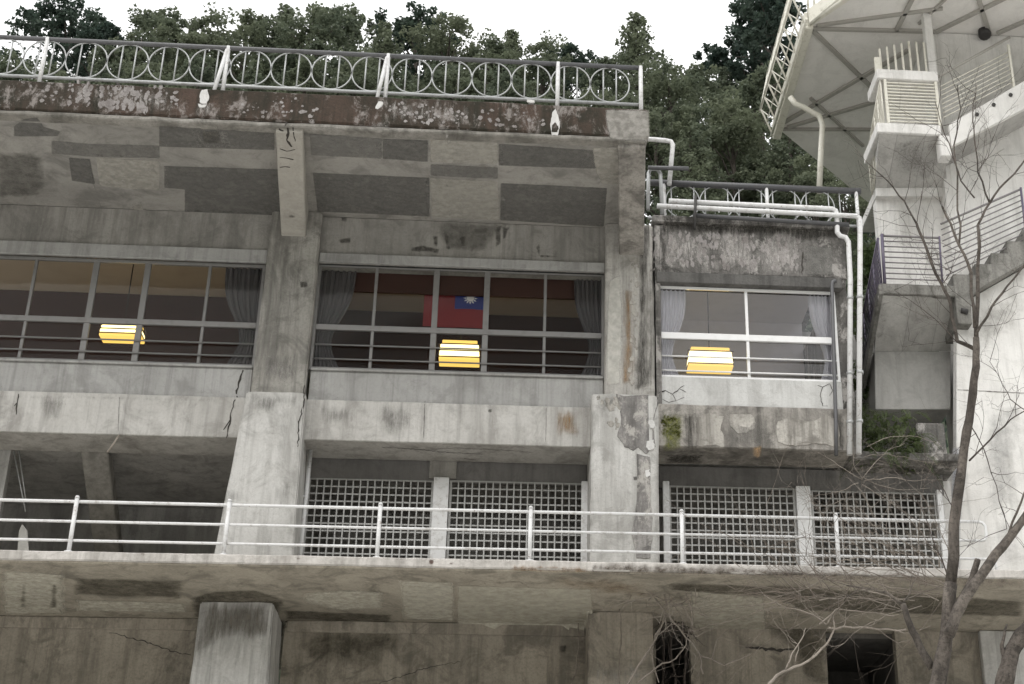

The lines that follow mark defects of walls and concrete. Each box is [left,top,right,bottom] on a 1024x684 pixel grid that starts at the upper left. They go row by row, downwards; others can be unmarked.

peeling [21,78,179,115]
peeling [198,89,209,108]
peeling [241,97,319,124]
crack [279,122,296,168]
damp [310,134,607,252]
crack [223,370,244,438]
crack [297,385,305,447]
flaking render [597,229,802,559]
flaking render [776,415,840,447]
crack [115,633,190,655]